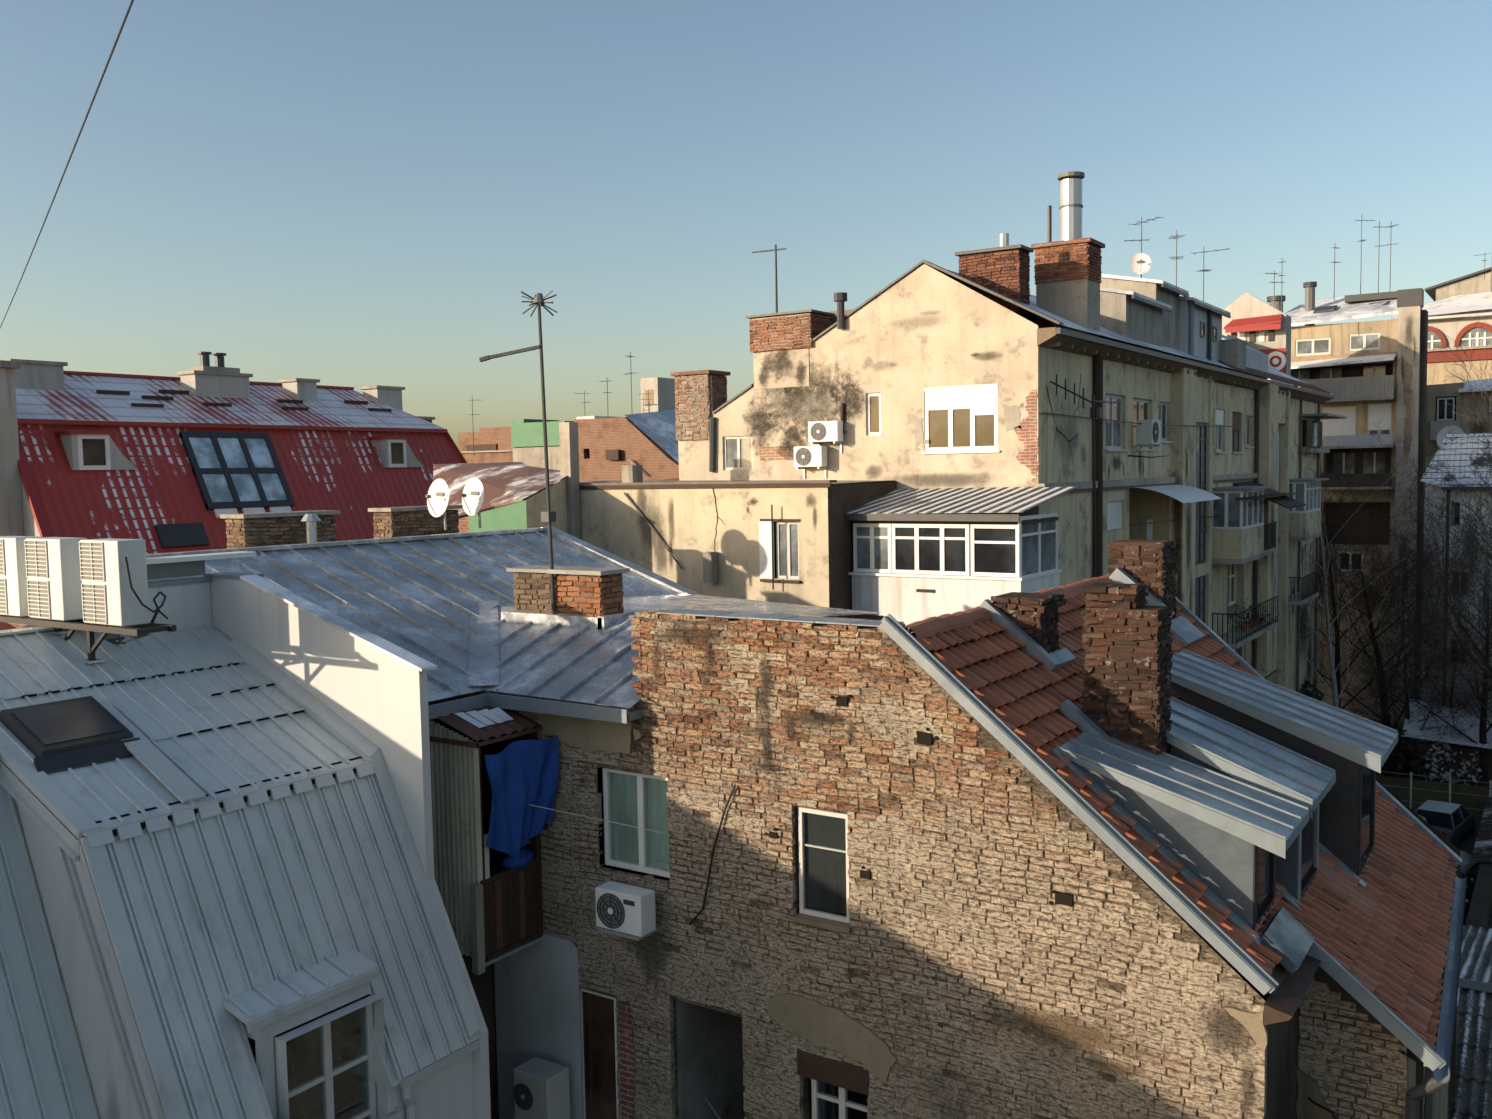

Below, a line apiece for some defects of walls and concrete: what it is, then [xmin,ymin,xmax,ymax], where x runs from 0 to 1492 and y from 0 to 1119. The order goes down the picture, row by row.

mould [750,350,866,452]
flaking render [1003,390,1040,482]
flaking render [1296,1068,1338,1119]